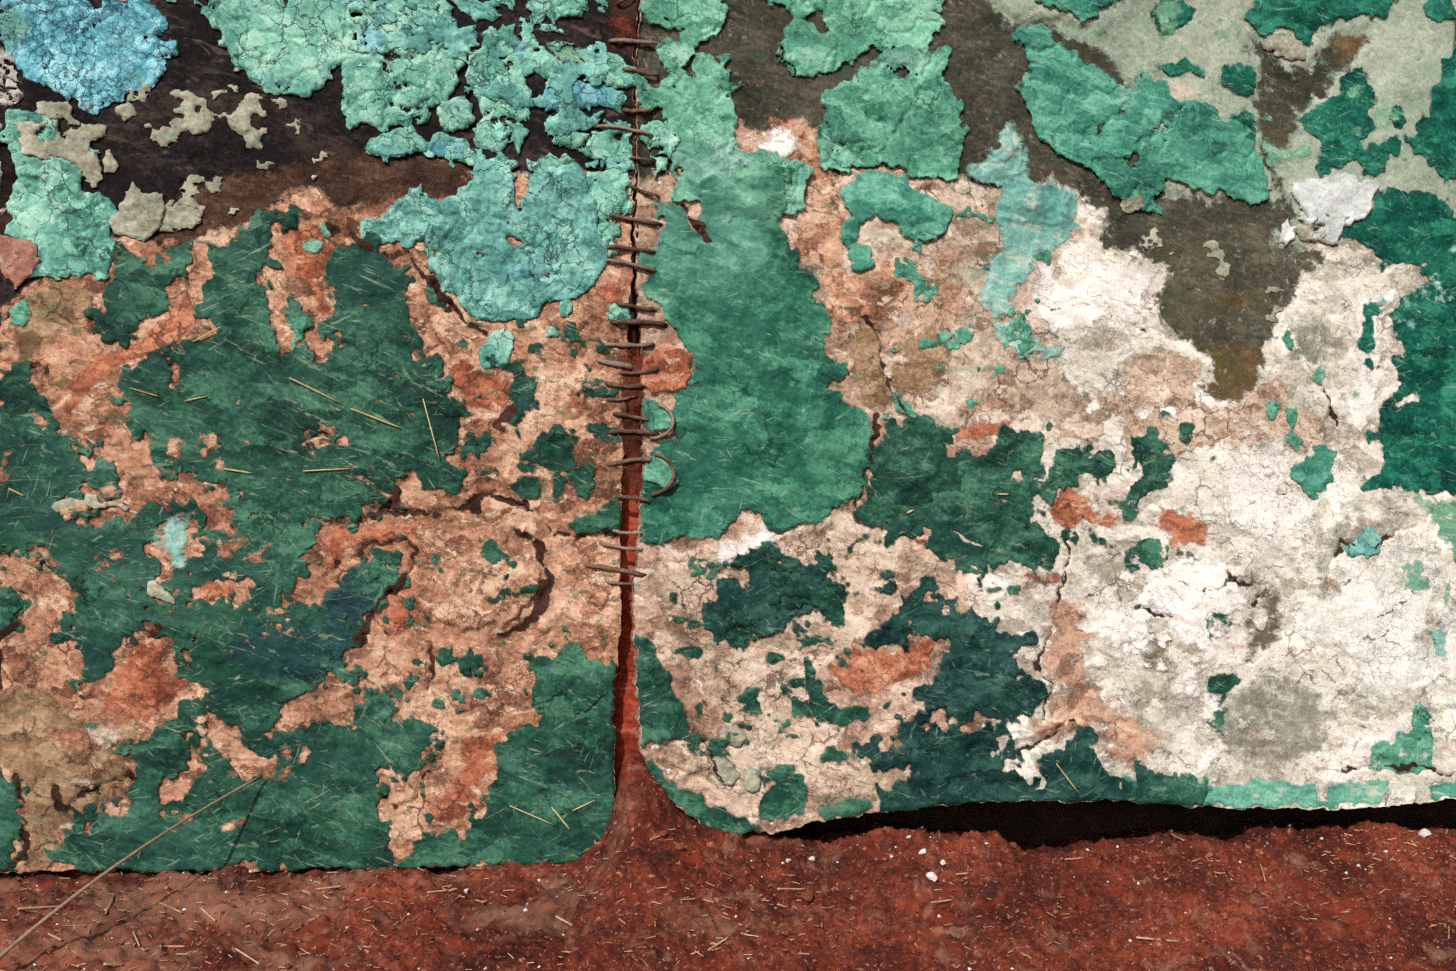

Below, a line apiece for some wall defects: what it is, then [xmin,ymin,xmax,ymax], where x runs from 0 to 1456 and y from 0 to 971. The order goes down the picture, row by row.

corrosion [609,6,652,52]
peeling [1357,298,1387,370]
corrosion [618,348,650,493]
leakage [1097,373,1148,427]
crack [334,486,617,646]
peeling [1117,507,1221,586]
leakage [1141,638,1171,669]
peeling [1180,593,1273,735]
leakage [1245,589,1280,663]
leakage [1192,679,1413,777]
peeling [1369,694,1456,775]
peeling [646,759,761,835]